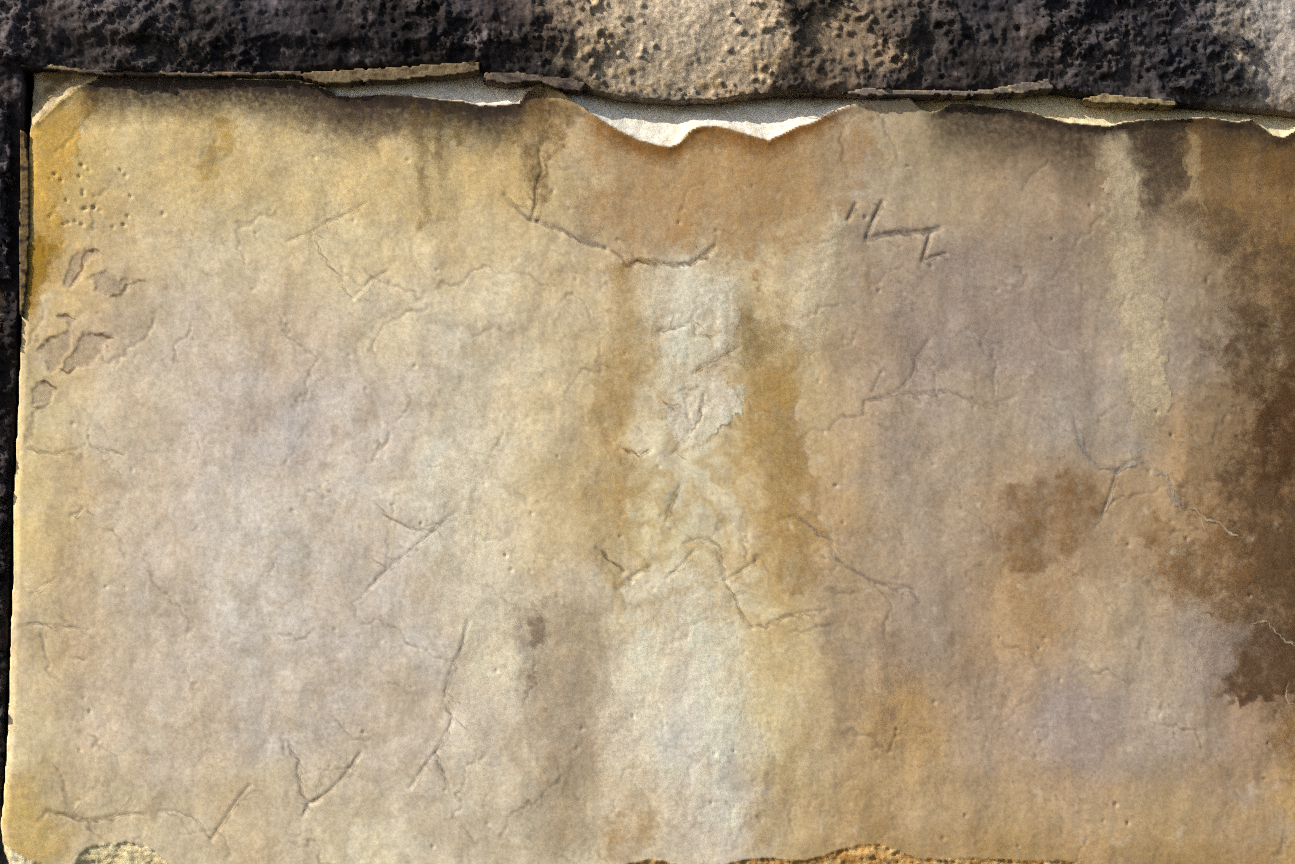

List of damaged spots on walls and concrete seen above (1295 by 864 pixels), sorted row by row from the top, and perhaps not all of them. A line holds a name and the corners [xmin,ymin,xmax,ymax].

spalling [318,70,535,106]
spalling [562,0,1295,147]
crack [514,163,593,245]
crack [630,255,707,266]
damp [787,213,845,339]
crack [849,205,941,263]
damp [1101,135,1171,414]
spalling [2,841,40,864]
spalling [75,842,167,864]
spalling [728,844,1078,864]